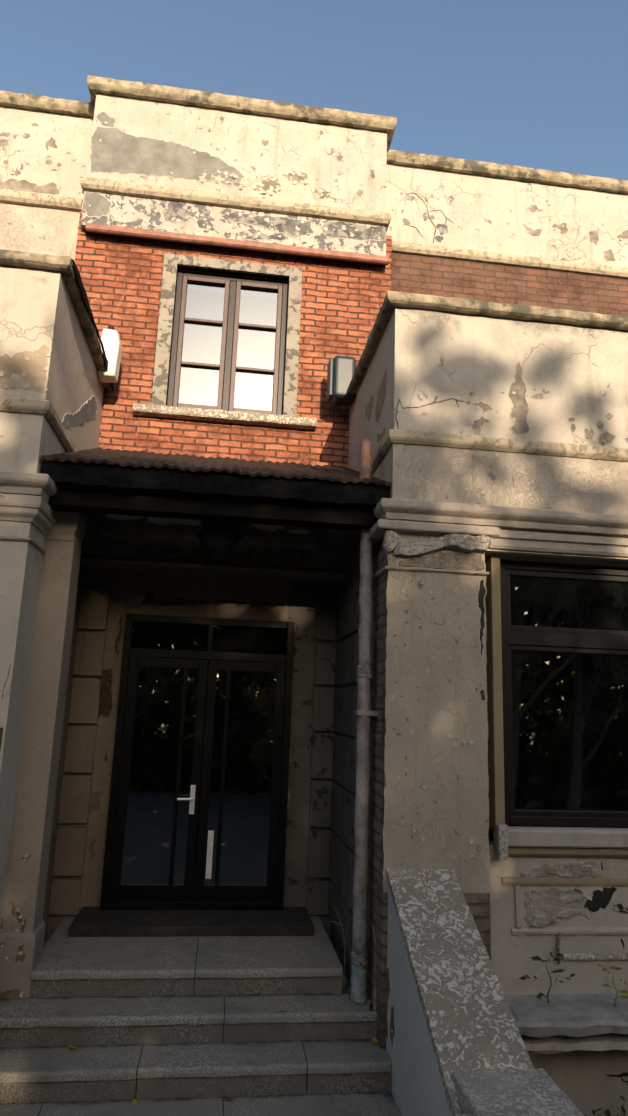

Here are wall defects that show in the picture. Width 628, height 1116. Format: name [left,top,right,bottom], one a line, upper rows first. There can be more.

peeling [0,160,61,196]
peeling [45,137,62,167]
peeling [89,112,331,201]
peeling [163,201,386,241]
crack [403,192,454,243]
peeling [589,229,628,261]
peeling [0,344,52,393]
crack [395,395,472,428]
peeling [469,392,493,436]
peeling [507,361,530,436]
peeling [568,413,628,445]
peeling [519,859,624,928]